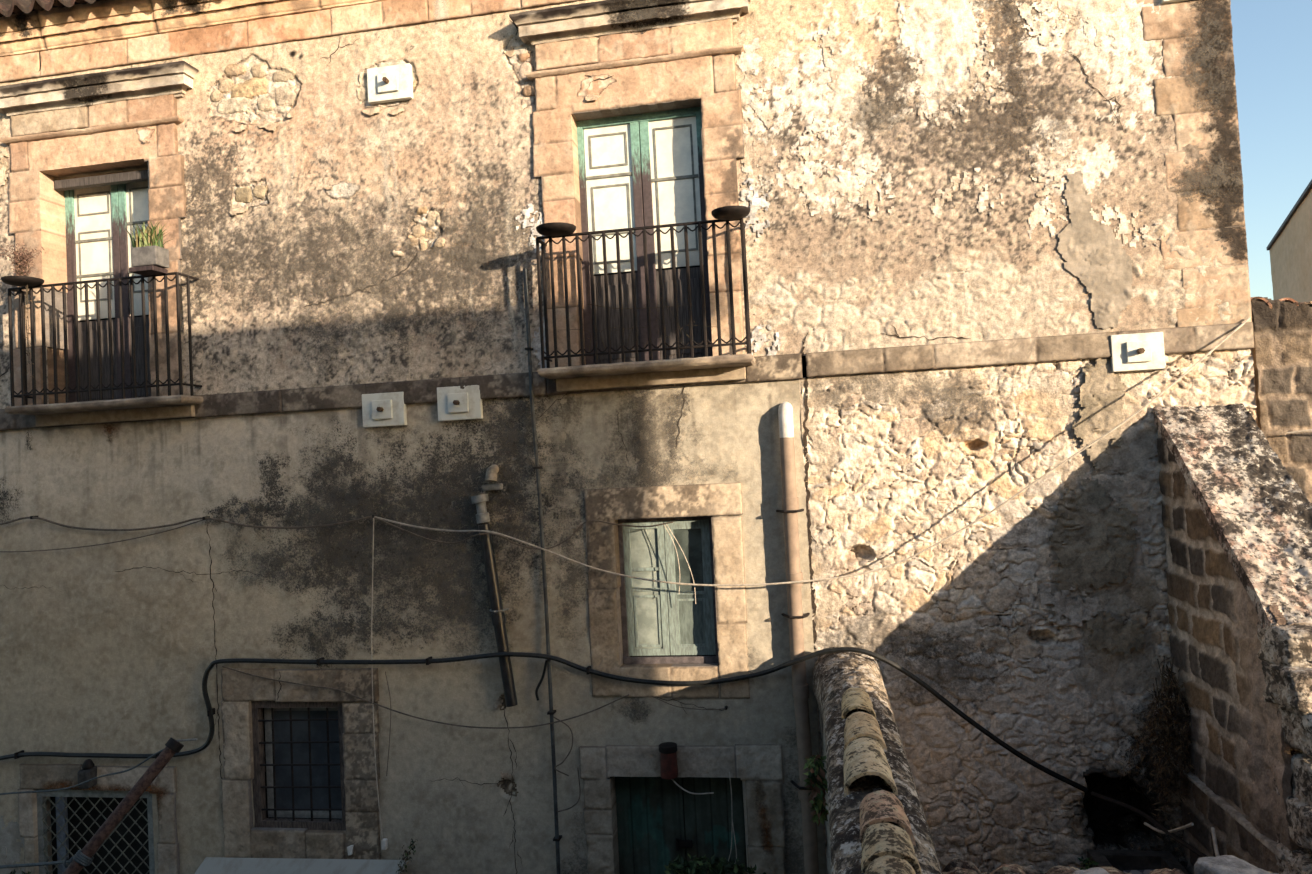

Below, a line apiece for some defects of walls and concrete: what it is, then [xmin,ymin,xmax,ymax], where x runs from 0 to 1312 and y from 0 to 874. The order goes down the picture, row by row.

spalling [229,178,269,215]
spalling [206,51,303,132]
damp [181,127,537,372]
spalling [392,206,445,257]
damp [604,0,692,35]
damp [855,0,1079,173]
damp [1169,0,1248,261]
damp [203,390,737,669]
crack [116,525,264,805]
crack [432,710,522,874]
spalling [497,771,518,797]